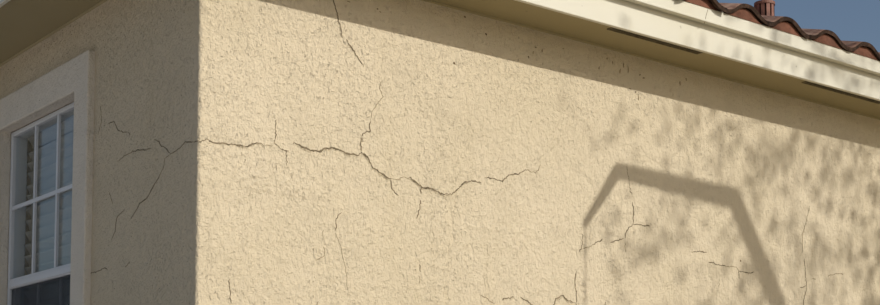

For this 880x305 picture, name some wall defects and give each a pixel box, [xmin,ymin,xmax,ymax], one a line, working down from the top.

crack [333,0,364,67]
crack [98,82,540,240]
crack [481,170,649,305]
crack [693,251,753,285]
crack [800,206,843,305]